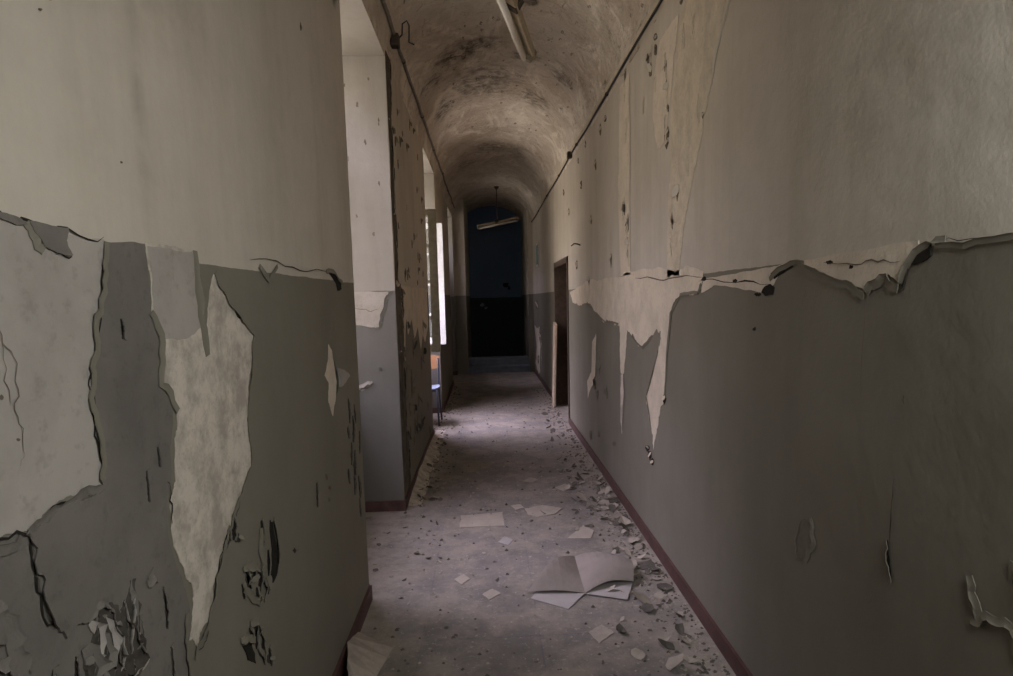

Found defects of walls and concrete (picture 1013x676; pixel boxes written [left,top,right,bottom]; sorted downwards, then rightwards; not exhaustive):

peeling [252,258,343,291]
flaking render [354,50,434,499]
peeling [570,0,946,465]
crack [935,232,1013,249]
peeling [0,211,256,676]
peeling [325,344,350,415]
peeling [347,400,362,517]
flaking render [241,518,281,666]